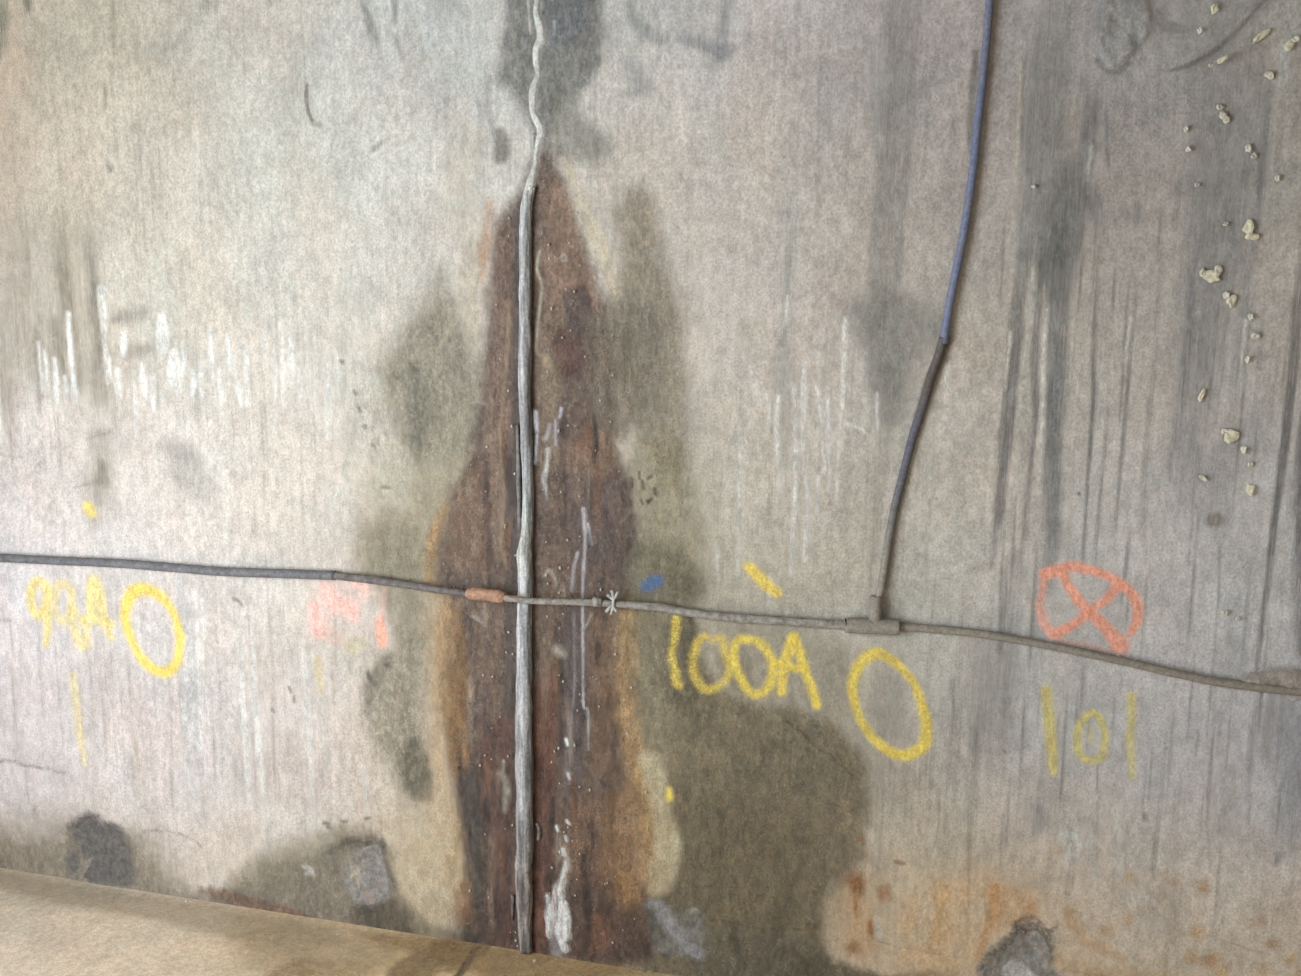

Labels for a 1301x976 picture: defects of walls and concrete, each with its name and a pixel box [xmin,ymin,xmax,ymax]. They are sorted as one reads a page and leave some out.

leakage [360,0,377,43]
leakage [494,129,509,164]
leakage [496,0,612,163]
leakage [627,0,734,62]
leakage [726,2,943,574]
leakage [993,38,1108,574]
leakage [1175,104,1269,452]
leakage [0,188,881,976]
corrosion [402,147,681,966]
leakage [1207,513,1225,527]
leakage [1256,290,1301,671]
spalling [977,915,1061,976]